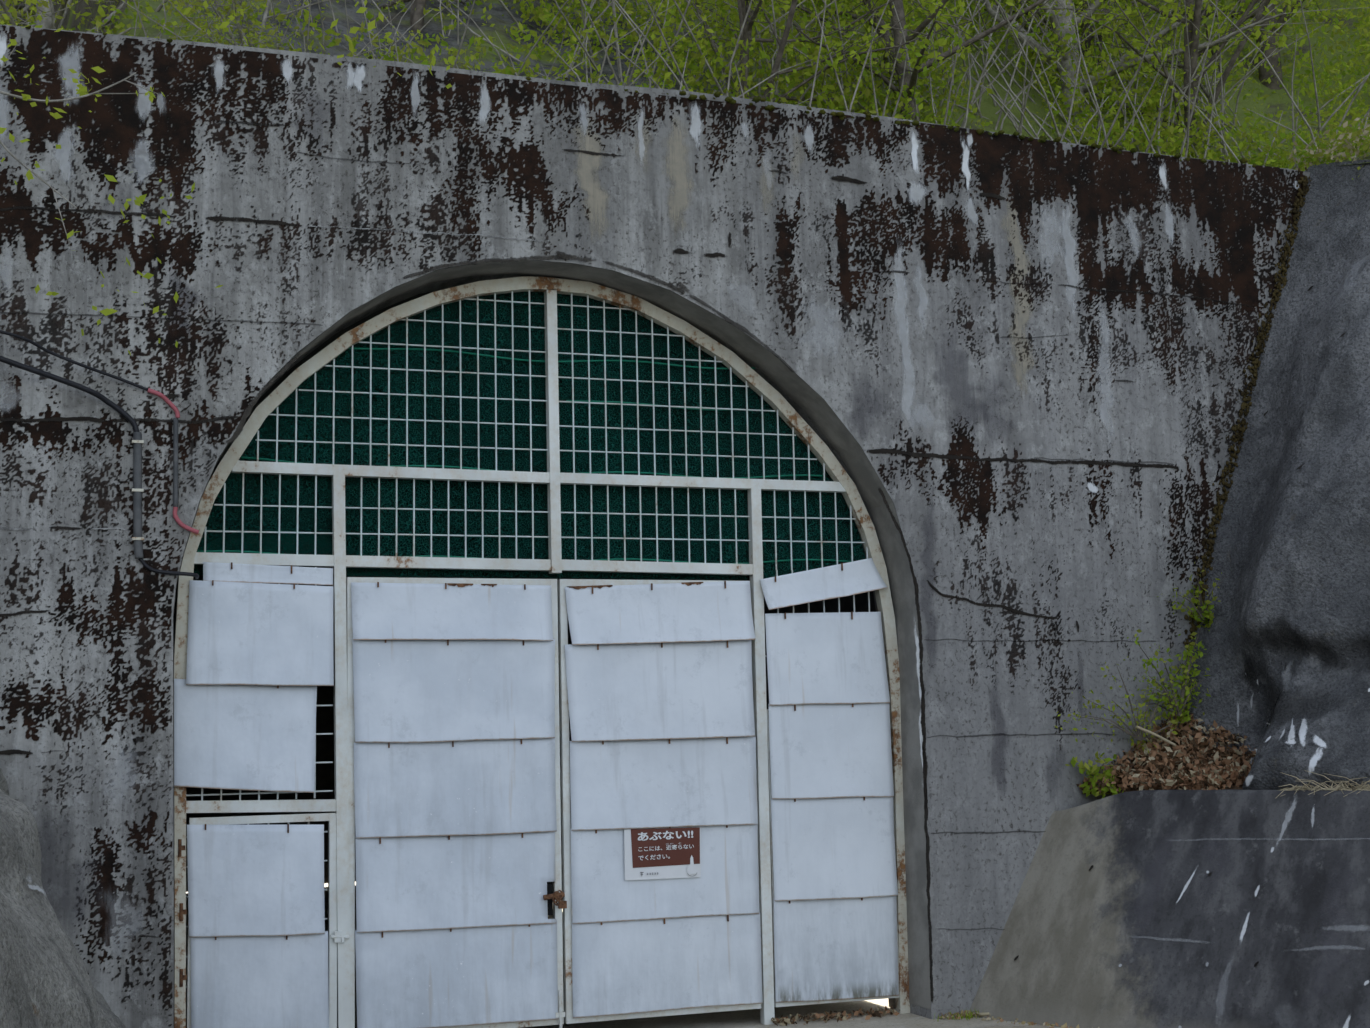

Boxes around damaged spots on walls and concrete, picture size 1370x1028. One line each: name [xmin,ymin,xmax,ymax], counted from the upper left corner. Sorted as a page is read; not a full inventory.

water stain [283,61,292,82]
water stain [480,87,489,121]
water stain [137,160,214,241]
water stain [894,131,925,202]
water stain [962,135,973,189]
water stain [134,264,196,340]
water stain [745,231,895,378]
crack [868,448,1179,469]
water stain [1031,538,1081,750]
water stain [25,614,172,813]
crack [878,488,1116,1002]
water stain [137,843,173,1027]